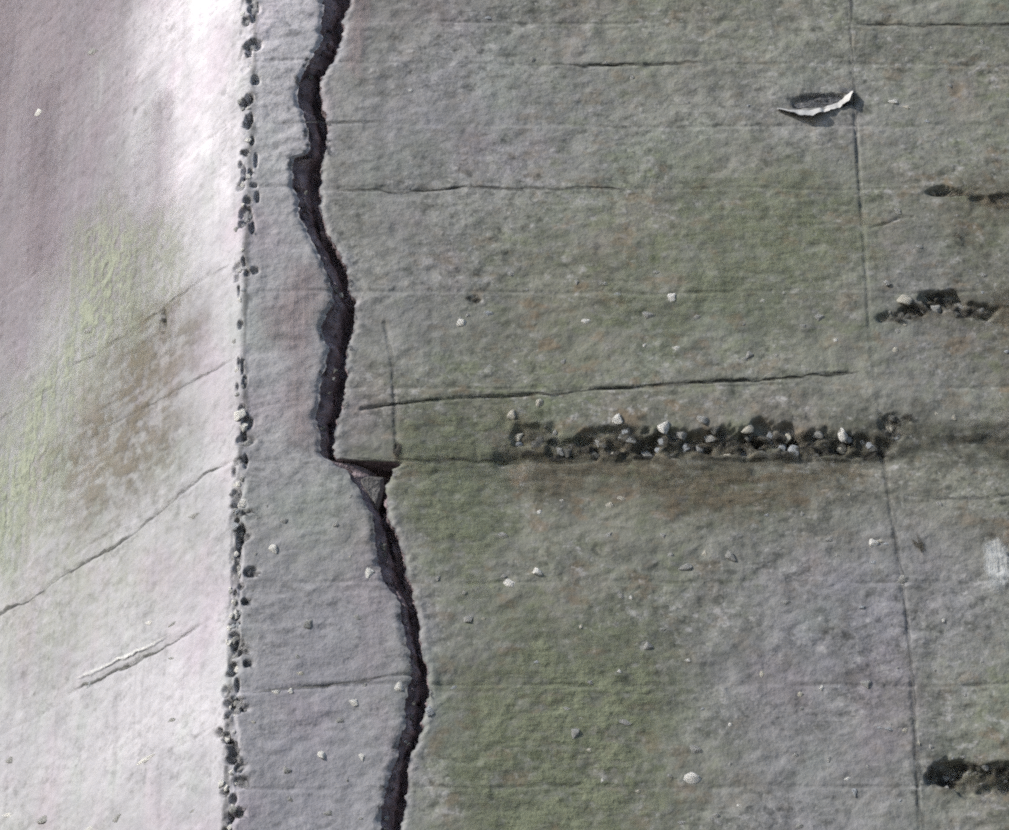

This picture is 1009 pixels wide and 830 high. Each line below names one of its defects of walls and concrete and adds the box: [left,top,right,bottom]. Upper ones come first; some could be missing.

crack [567,59,704,67]
peeling [777,87,854,116]
damp [0,0,109,306]
crack [377,370,859,408]
crack [287,0,619,830]
spalling [562,426,658,456]
hole [700,431,801,455]
crack [258,676,380,692]